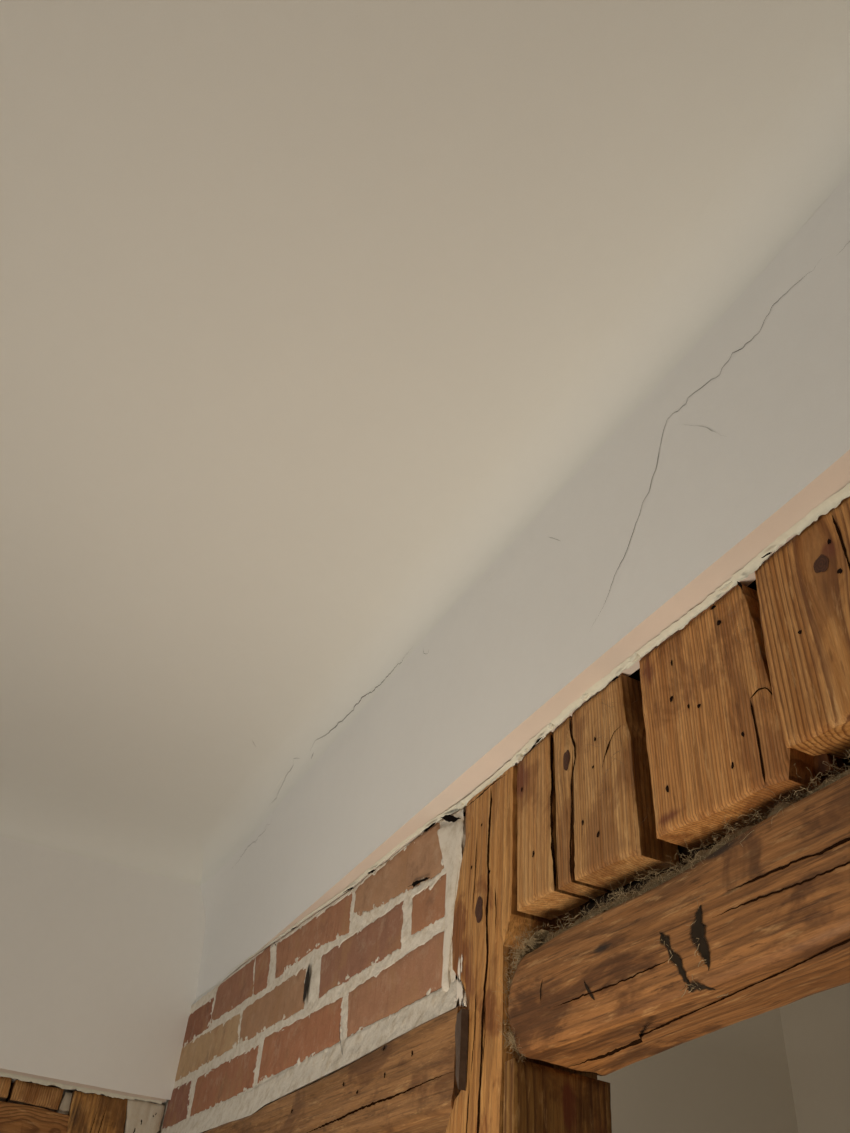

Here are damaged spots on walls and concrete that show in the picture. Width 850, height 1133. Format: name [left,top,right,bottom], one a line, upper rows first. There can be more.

crack [832,515,850,570]